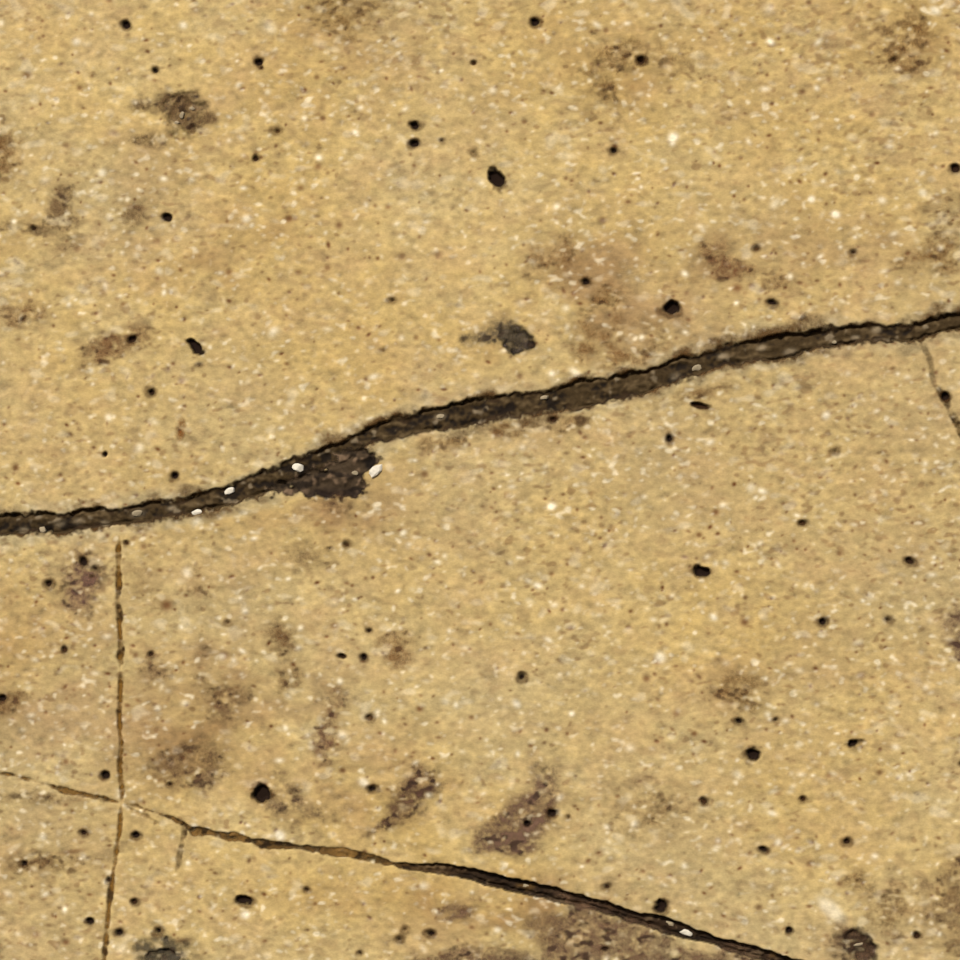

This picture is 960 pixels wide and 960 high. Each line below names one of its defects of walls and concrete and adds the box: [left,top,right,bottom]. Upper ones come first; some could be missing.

crack [0,303,960,960]